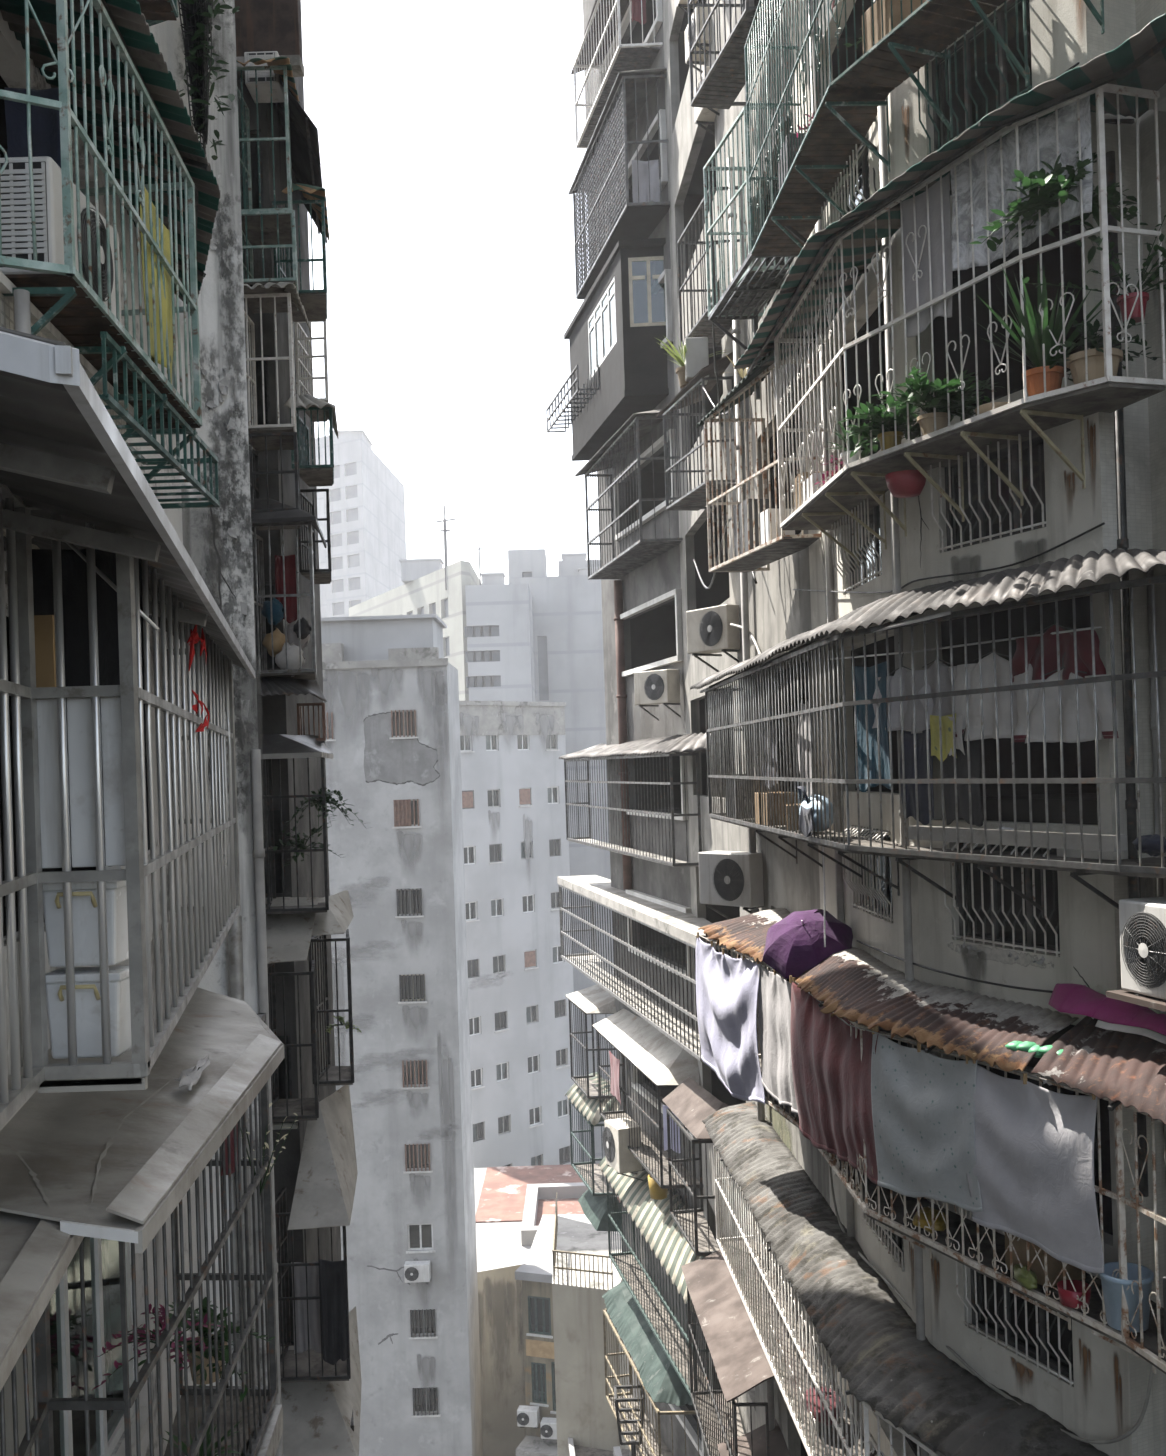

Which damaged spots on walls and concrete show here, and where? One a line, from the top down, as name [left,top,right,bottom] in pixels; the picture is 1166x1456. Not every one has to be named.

flaking render [363,712,440,786]
corrosion [1011,1357,1033,1384]
corrosion [1079,1339,1091,1386]
corrosion [1114,1354,1122,1410]